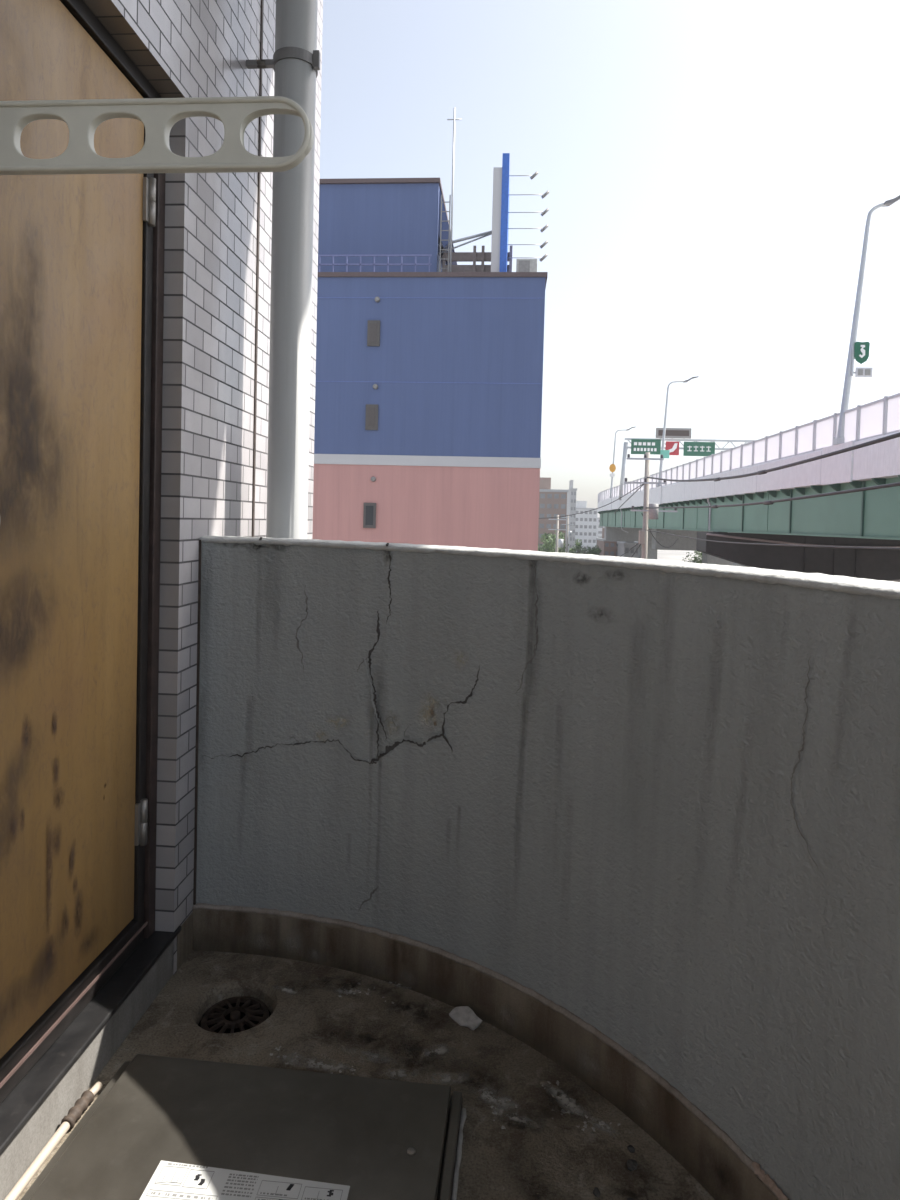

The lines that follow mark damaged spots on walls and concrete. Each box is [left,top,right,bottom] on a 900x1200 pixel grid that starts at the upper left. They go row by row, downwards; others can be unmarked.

crack [204,542,480,764]
crack [790,658,822,873]